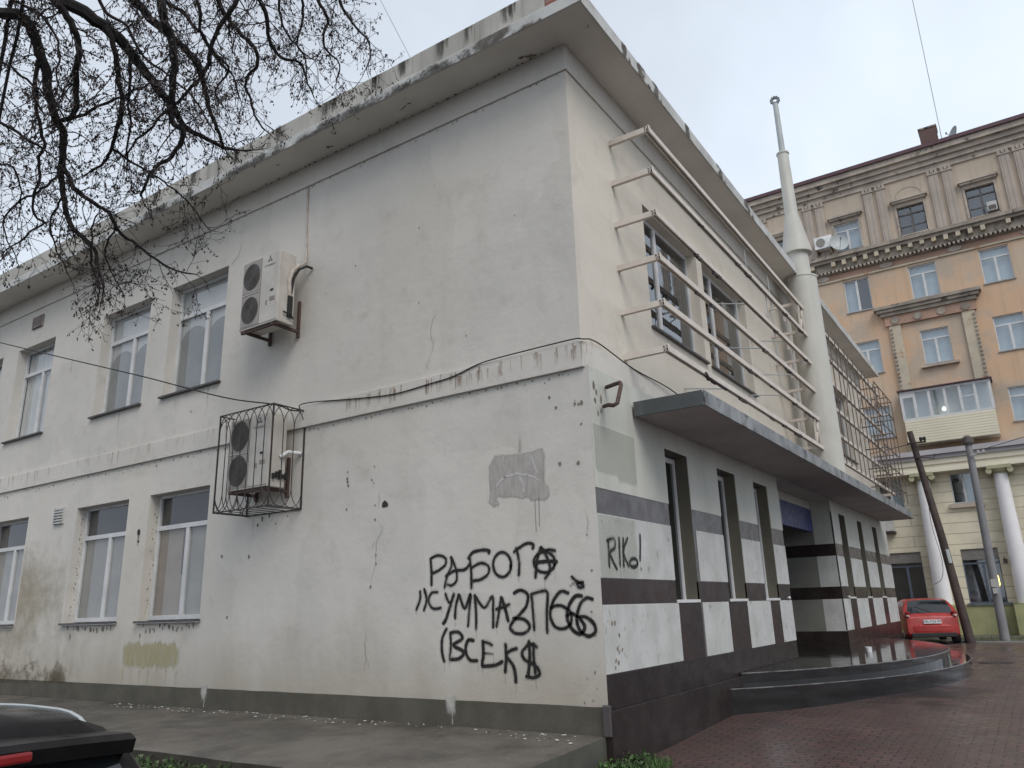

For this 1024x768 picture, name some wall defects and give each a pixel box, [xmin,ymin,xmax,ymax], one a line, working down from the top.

water stain [385,60,406,97]